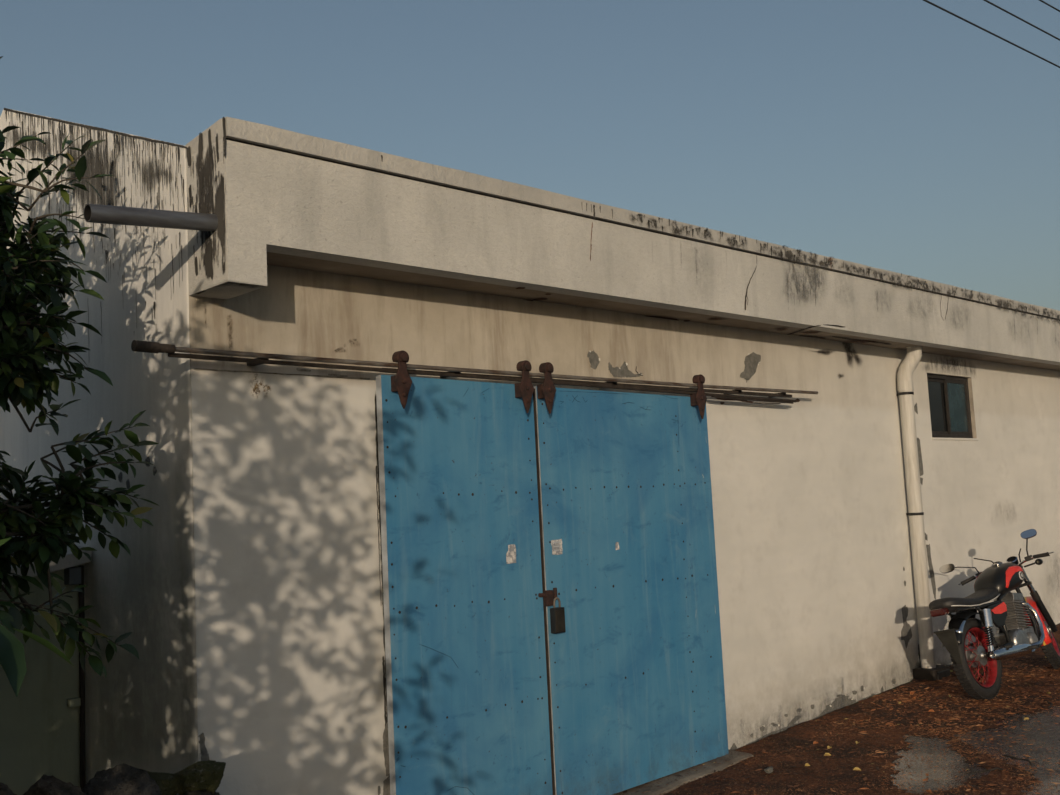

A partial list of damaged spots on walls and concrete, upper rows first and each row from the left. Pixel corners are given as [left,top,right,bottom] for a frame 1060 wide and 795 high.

damp [4,108,254,293]
damp [632,214,1060,323]
peeling [587,350,643,378]
spalling [740,352,761,380]
damp [845,340,873,363]
peeling [901,605,912,648]
peeling [198,733,212,761]
peeling [378,722,390,795]